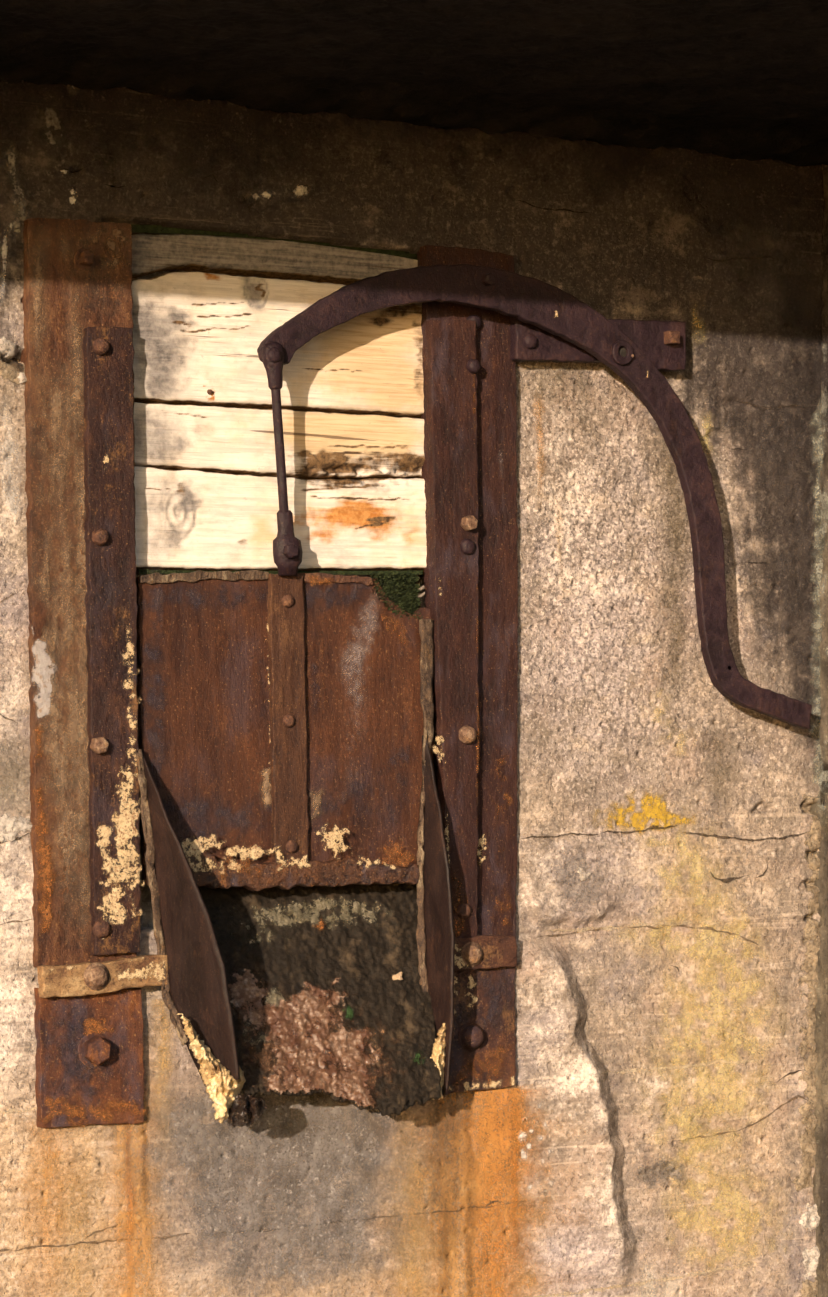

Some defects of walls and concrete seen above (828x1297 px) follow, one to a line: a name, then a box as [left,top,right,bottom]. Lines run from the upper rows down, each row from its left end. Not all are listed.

crack [521,825,805,883]
peeling [228,968,379,1108]
rust [116,1106,155,1297]
leakage [148,1090,395,1297]
rust [408,1088,526,1297]